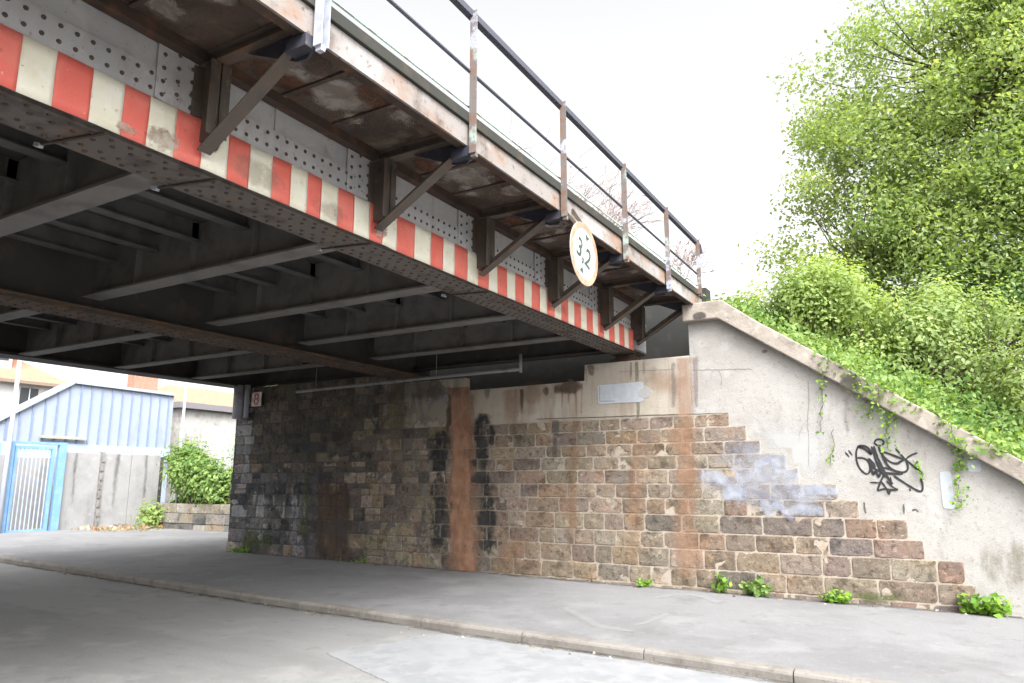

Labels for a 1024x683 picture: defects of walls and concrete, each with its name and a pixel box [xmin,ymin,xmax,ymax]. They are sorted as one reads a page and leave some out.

rust [446,387,476,572]